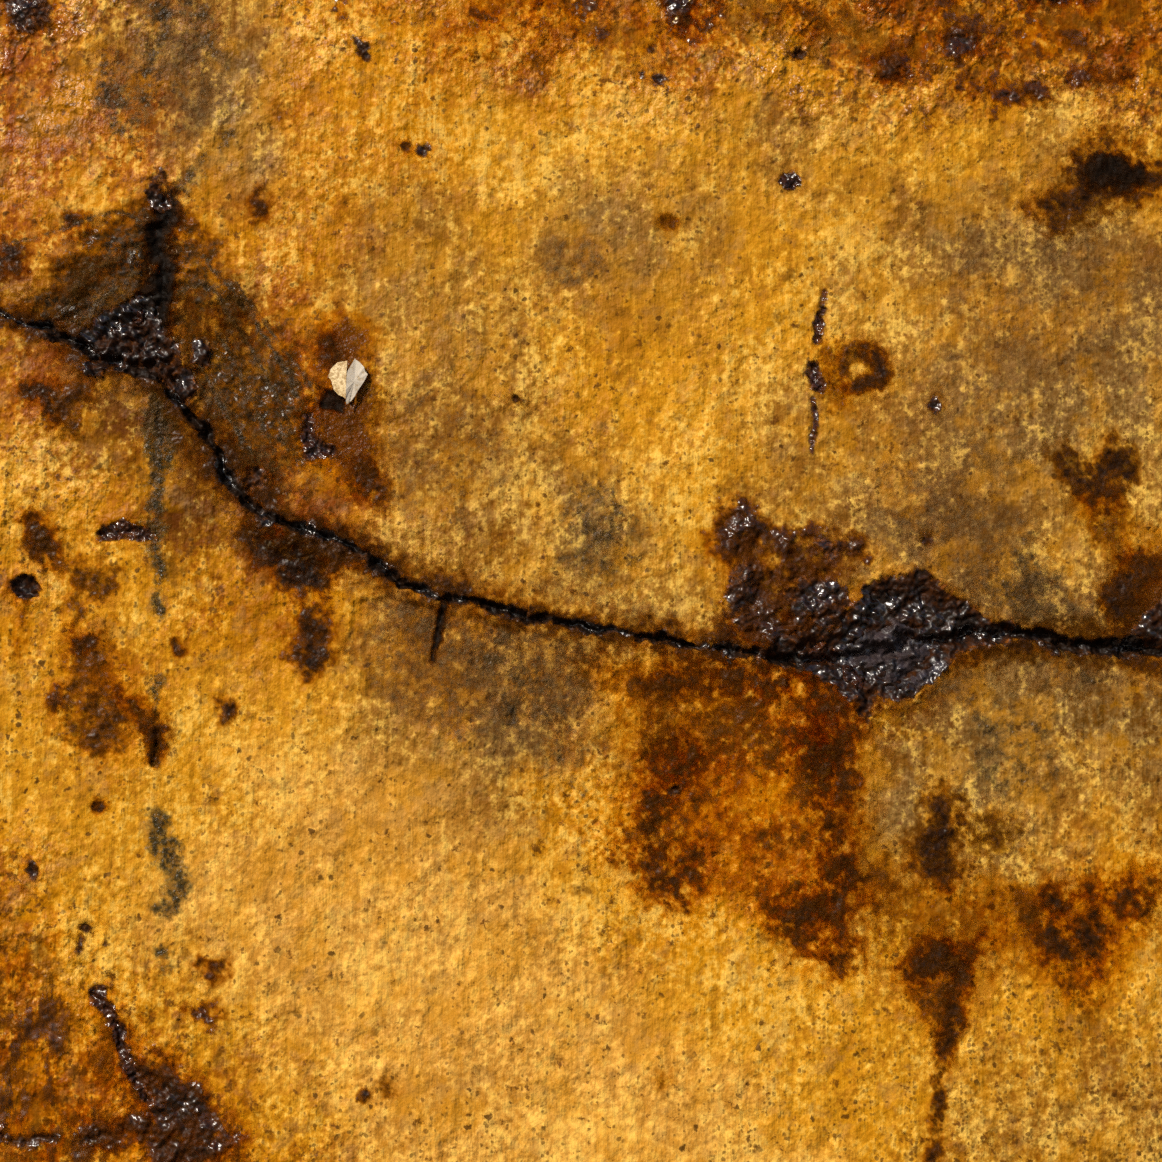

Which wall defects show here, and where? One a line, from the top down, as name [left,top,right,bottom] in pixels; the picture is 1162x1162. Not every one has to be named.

rust [1021,126,1162,232]
crack [0,127,804,674]
crack [804,288,828,454]
water stain [149,674,165,757]
water stain [143,384,179,615]
rust [706,497,873,646]
crack [942,600,1162,686]
rust [1052,433,1162,649]
water stain [145,808,192,917]
rust [609,664,895,977]
rust [47,1024,245,1162]
rust [899,939,977,1162]